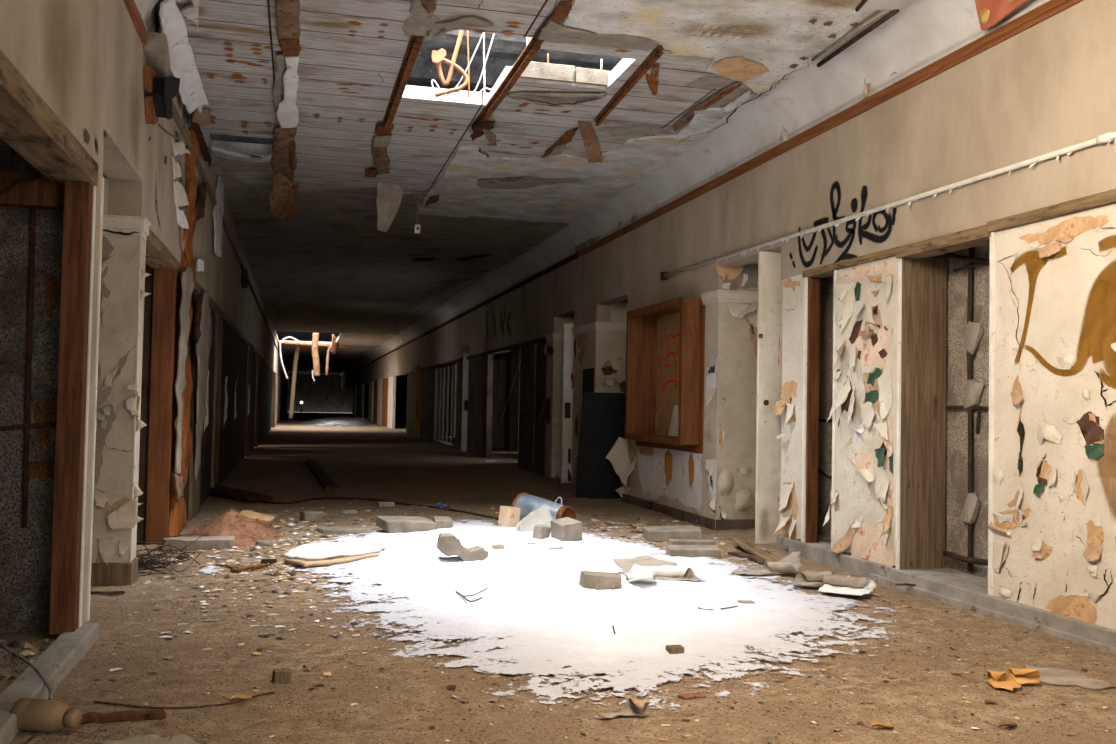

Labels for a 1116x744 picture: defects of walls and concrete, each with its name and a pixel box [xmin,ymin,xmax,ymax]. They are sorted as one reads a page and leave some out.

spalling [401,14,494,41]
spalling [538,18,659,51]
corrosion [397,116,457,134]
peeling [714,229,822,357]
peeling [94,236,151,565]
peeling [774,381,797,439]
peeling [826,259,895,567]
peeling [823,490,838,526]
peeling [988,375,1056,574]
peeling [1062,412,1116,562]
peeling [1046,590,1100,624]
crack [1099,570,1112,597]